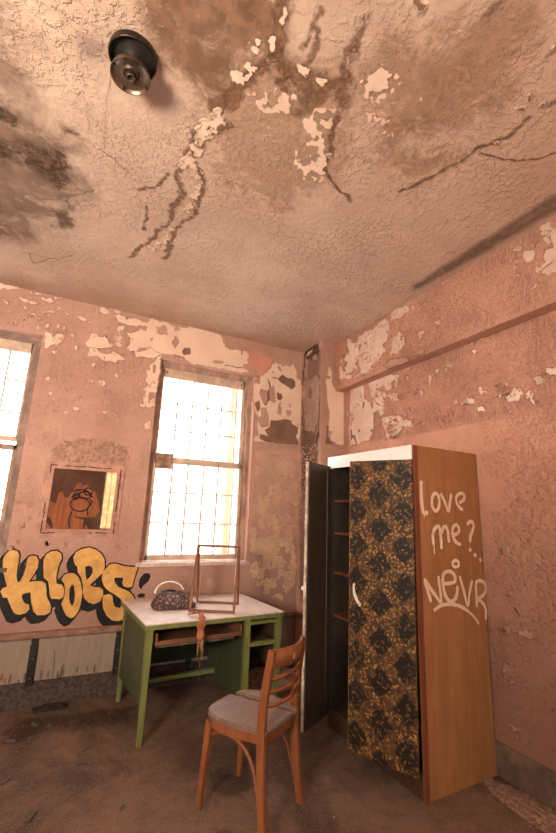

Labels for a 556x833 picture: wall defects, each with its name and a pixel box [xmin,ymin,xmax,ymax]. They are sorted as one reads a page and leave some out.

water stain [145,0,368,202]
flaking render [249,36,276,54]
flaking render [230,62,297,115]
flaking render [297,64,327,87]
flaking render [360,64,401,137]
water stain [0,100,78,239]
water stain [129,128,205,260]
flaking render [178,107,227,217]
flaking render [293,106,336,183]
water stain [399,116,556,192]
peeling [0,283,455,447]
water stain [305,344,319,359]